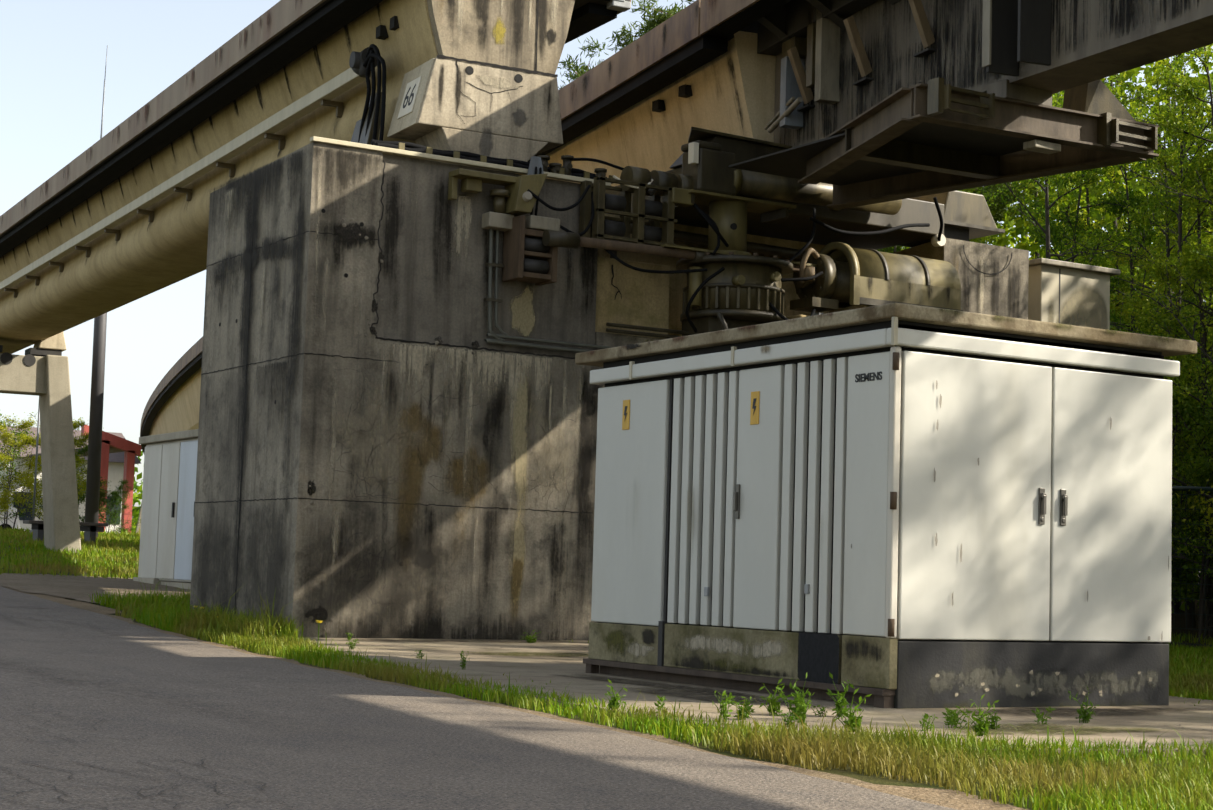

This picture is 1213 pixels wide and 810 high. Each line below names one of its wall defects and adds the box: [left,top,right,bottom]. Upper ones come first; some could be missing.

water stain [448,0,557,56]
water stain [1110,0,1198,35]
water stain [439,65,461,109]
water stain [433,182,489,296]
water stain [568,224,598,313]
water stain [212,147,400,504]
water stain [382,344,599,605]
water stain [339,591,573,640]